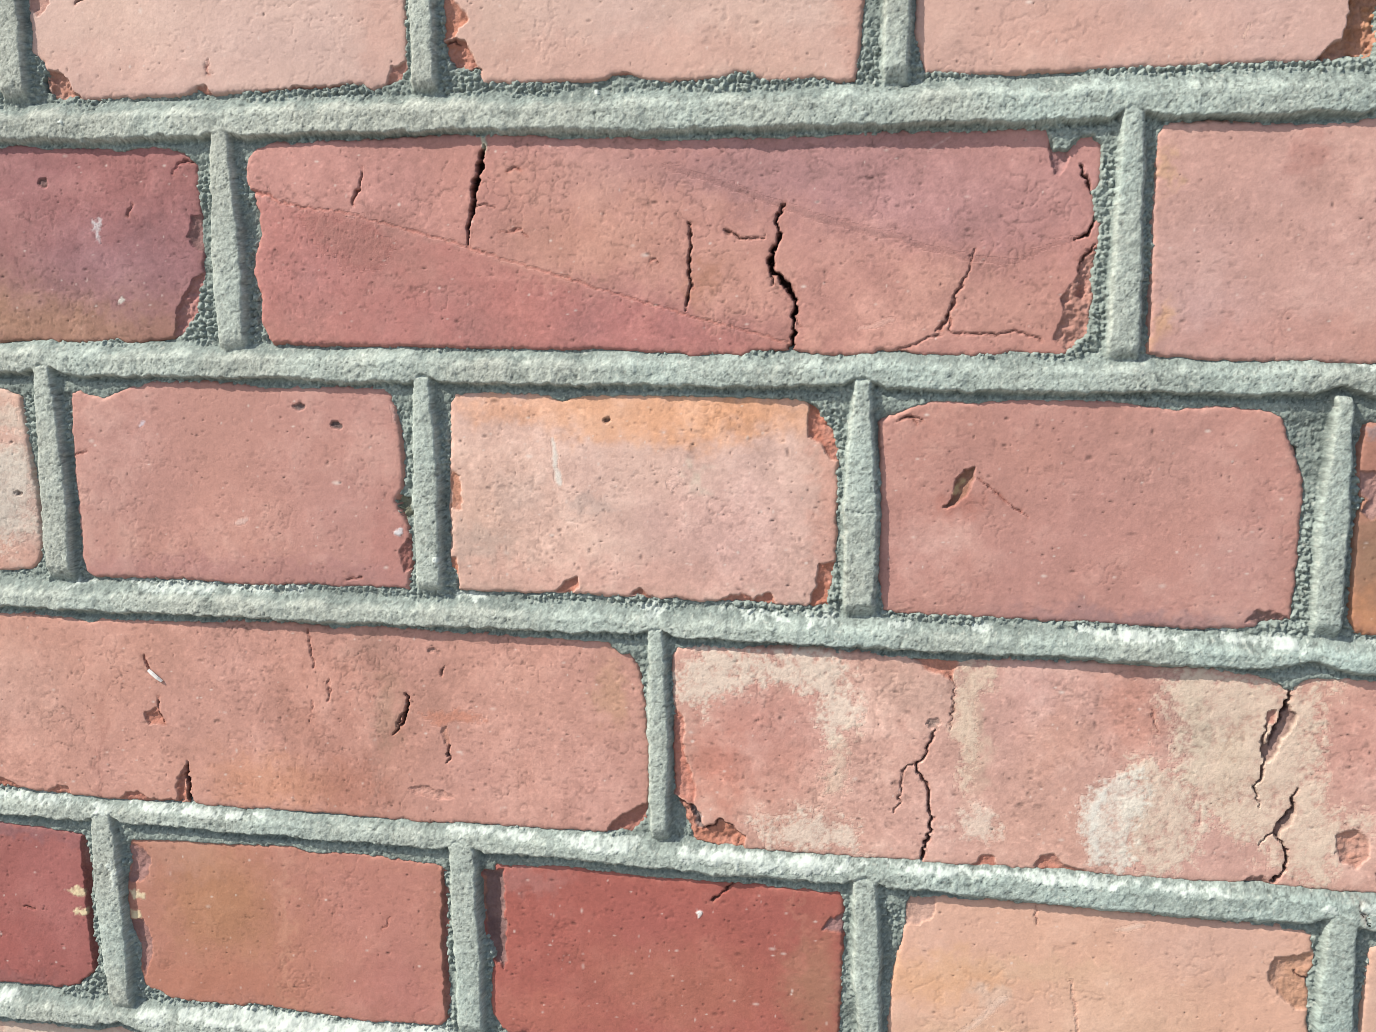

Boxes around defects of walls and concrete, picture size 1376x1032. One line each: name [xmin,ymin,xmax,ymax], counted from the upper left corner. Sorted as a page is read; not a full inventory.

spalling [1317,0,1376,61]
water stain [455,590,490,605]
water stain [637,599,668,620]
crack [892,675,957,862]
water stain [672,602,1376,917]
crack [1243,689,1300,884]